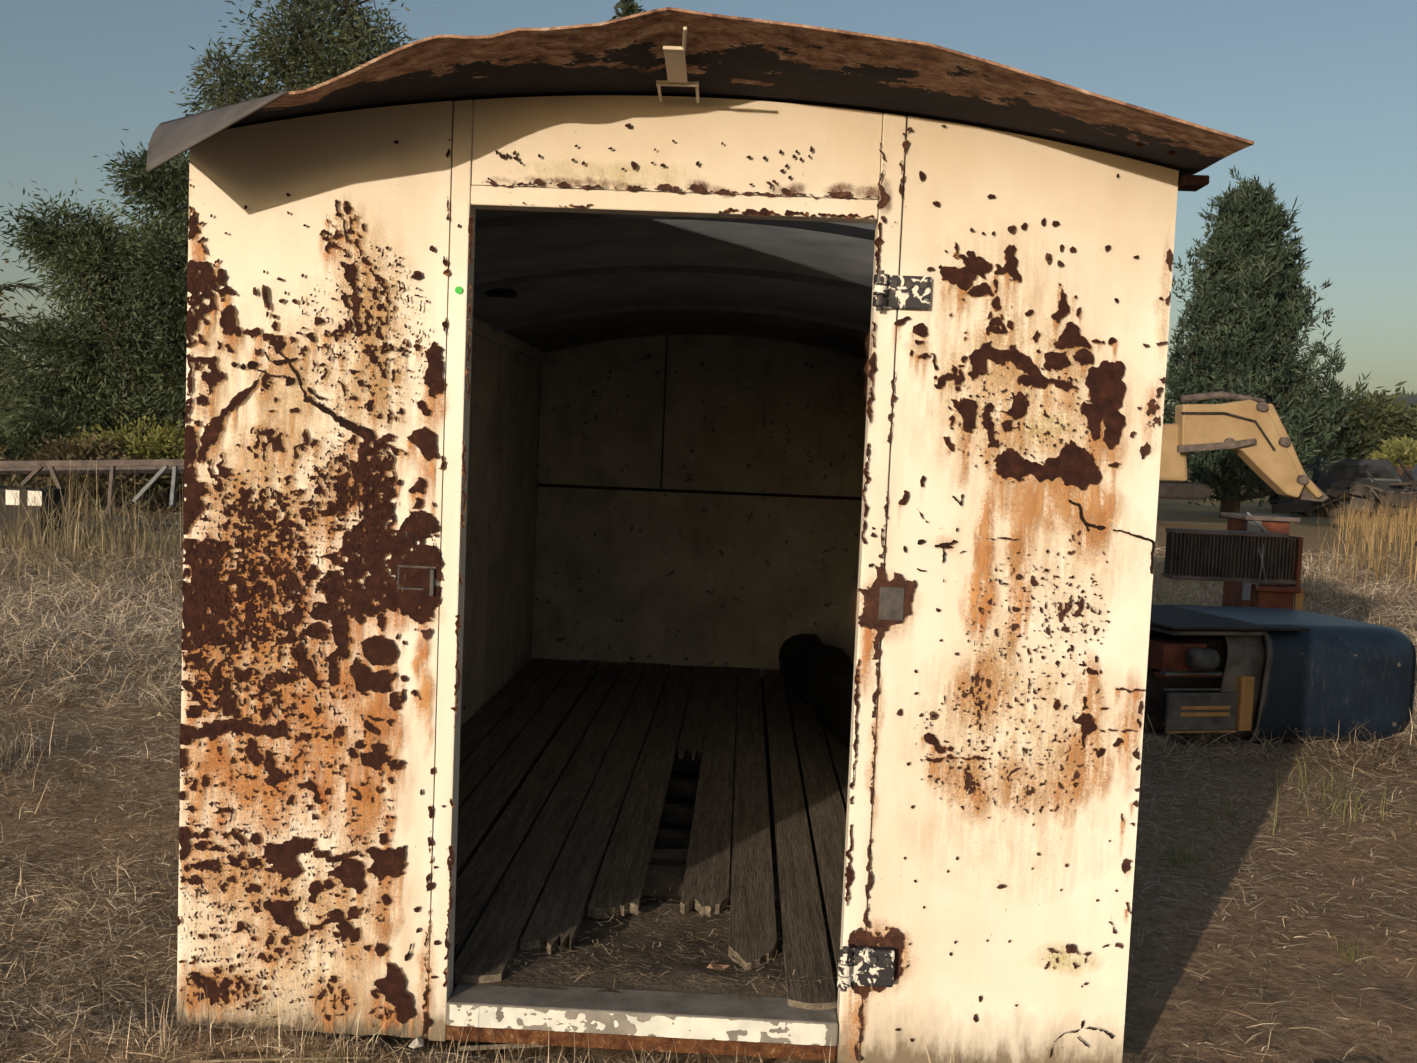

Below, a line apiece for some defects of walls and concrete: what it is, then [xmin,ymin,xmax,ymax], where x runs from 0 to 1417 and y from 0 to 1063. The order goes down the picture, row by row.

corrosion [482,127,925,274]
corrosion [177,197,926,1061]
corrosion [1109,788,1140,842]
corrosion [1121,858,1133,874]
corrosion [1042,890,1132,988]
peeling [449,1004,827,1046]